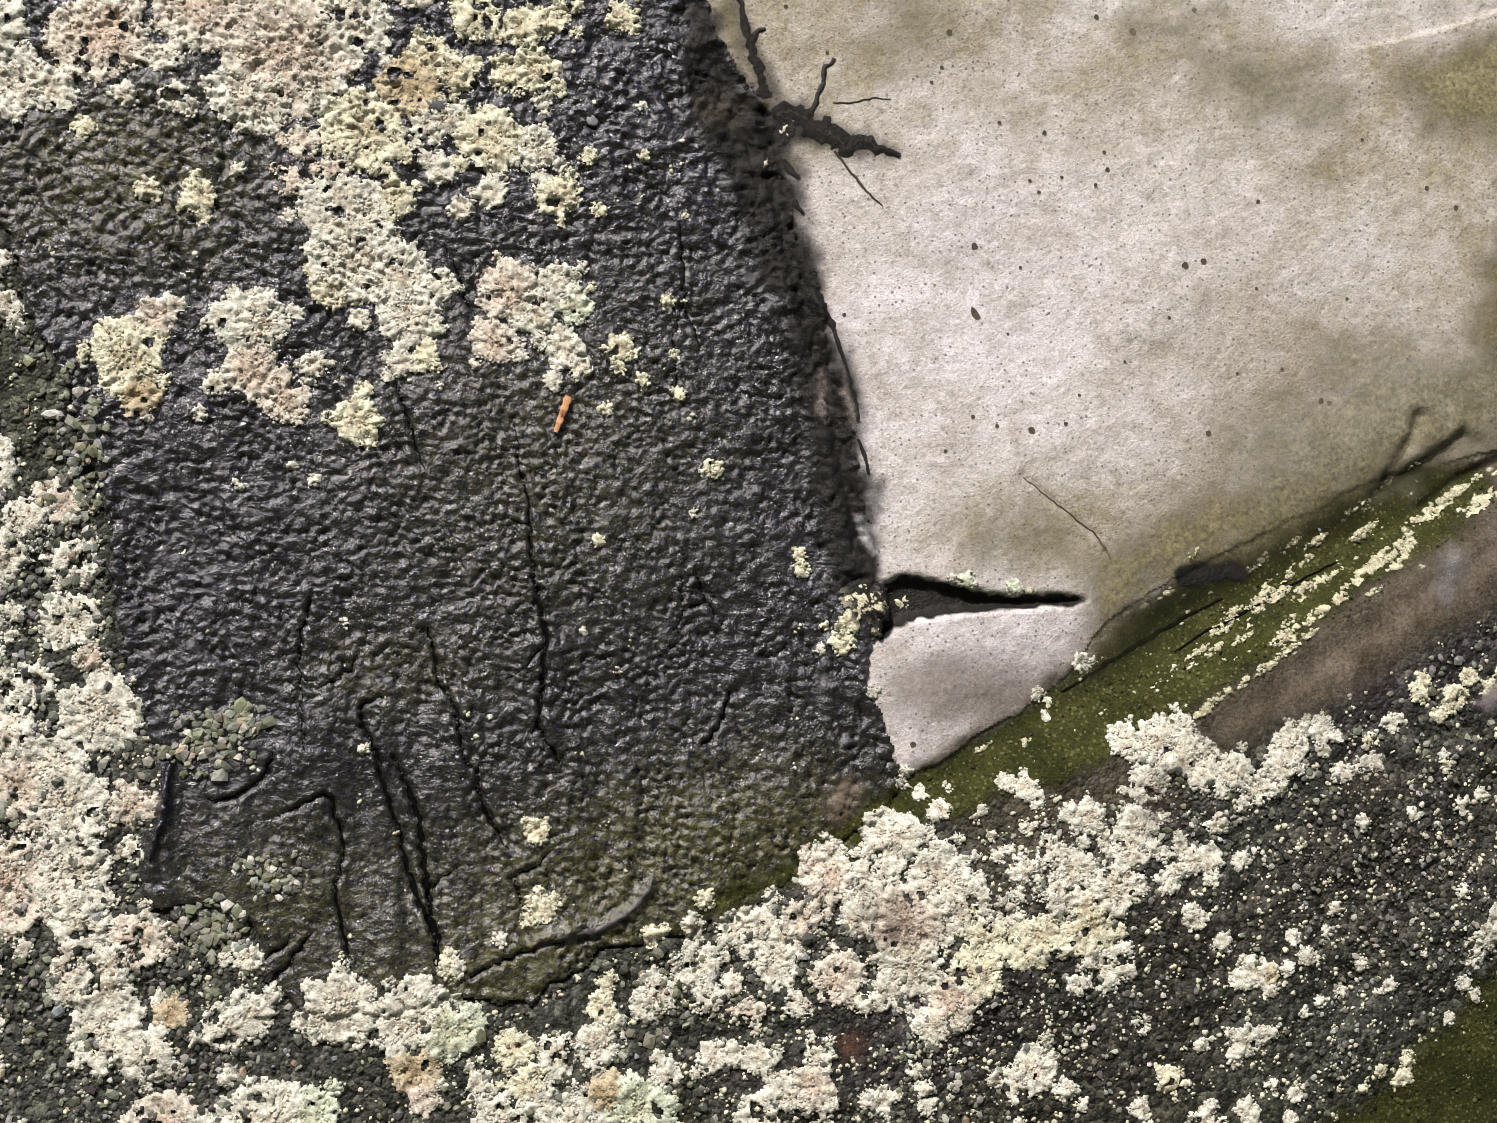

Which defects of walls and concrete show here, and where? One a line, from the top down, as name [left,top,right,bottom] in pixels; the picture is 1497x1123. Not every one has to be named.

crack [1421,437,1497,469]
crack [493,427,563,768]
crack [880,573,1085,639]
crack [1061,561,1338,692]
water stain [1174,560,1249,586]
water stain [1216,531,1497,738]
crack [207,595,565,995]